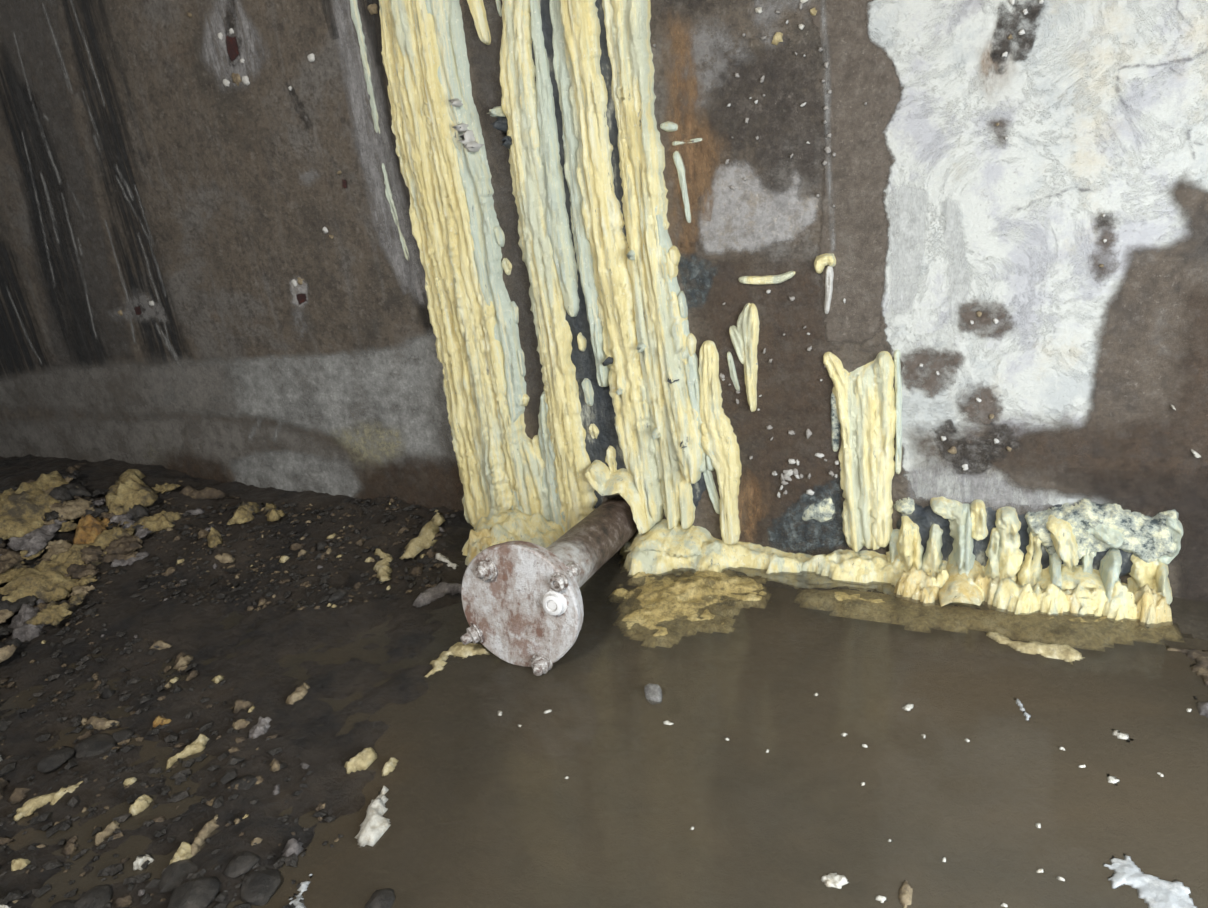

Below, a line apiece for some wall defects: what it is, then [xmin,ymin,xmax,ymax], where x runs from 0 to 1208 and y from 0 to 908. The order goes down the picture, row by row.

water stain [0,0,1208,624]
flaking render [867,0,1208,510]